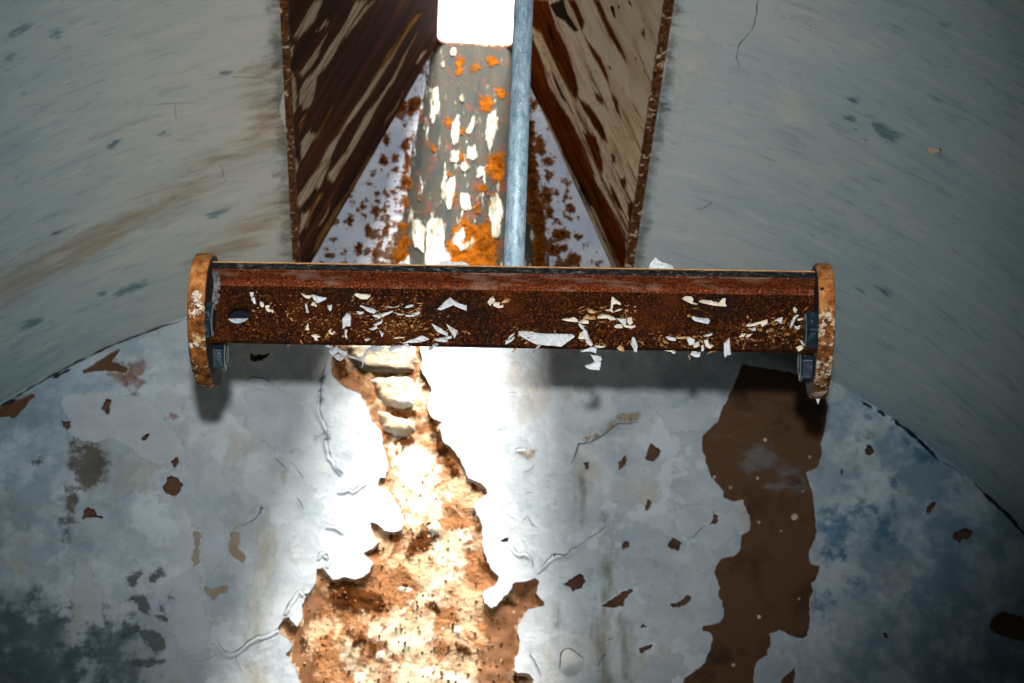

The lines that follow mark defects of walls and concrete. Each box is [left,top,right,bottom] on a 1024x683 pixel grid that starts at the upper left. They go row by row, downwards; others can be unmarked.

rust [594,0,645,73]
crack [735,1,758,71]
peeling [290,0,427,255]
rust [324,133,425,264]
peeling [429,87,440,123]
peeling [398,110,499,265]
rust [444,151,506,266]
peeling [488,193,503,237]
rust [526,0,634,268]
flaking render [278,293,544,683]
crack [203,590,305,672]
leakage [675,565,713,618]